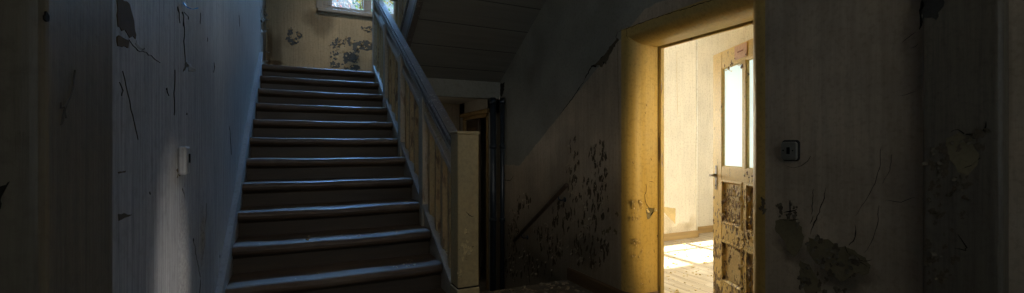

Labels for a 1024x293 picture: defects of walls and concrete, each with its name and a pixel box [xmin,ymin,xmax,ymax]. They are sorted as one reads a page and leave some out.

spalling [116,0,145,50]
crack [129,6,215,115]
peeling [329,26,372,71]
crack [119,71,138,139]
peeling [566,135,609,217]
spalling [713,171,870,293]